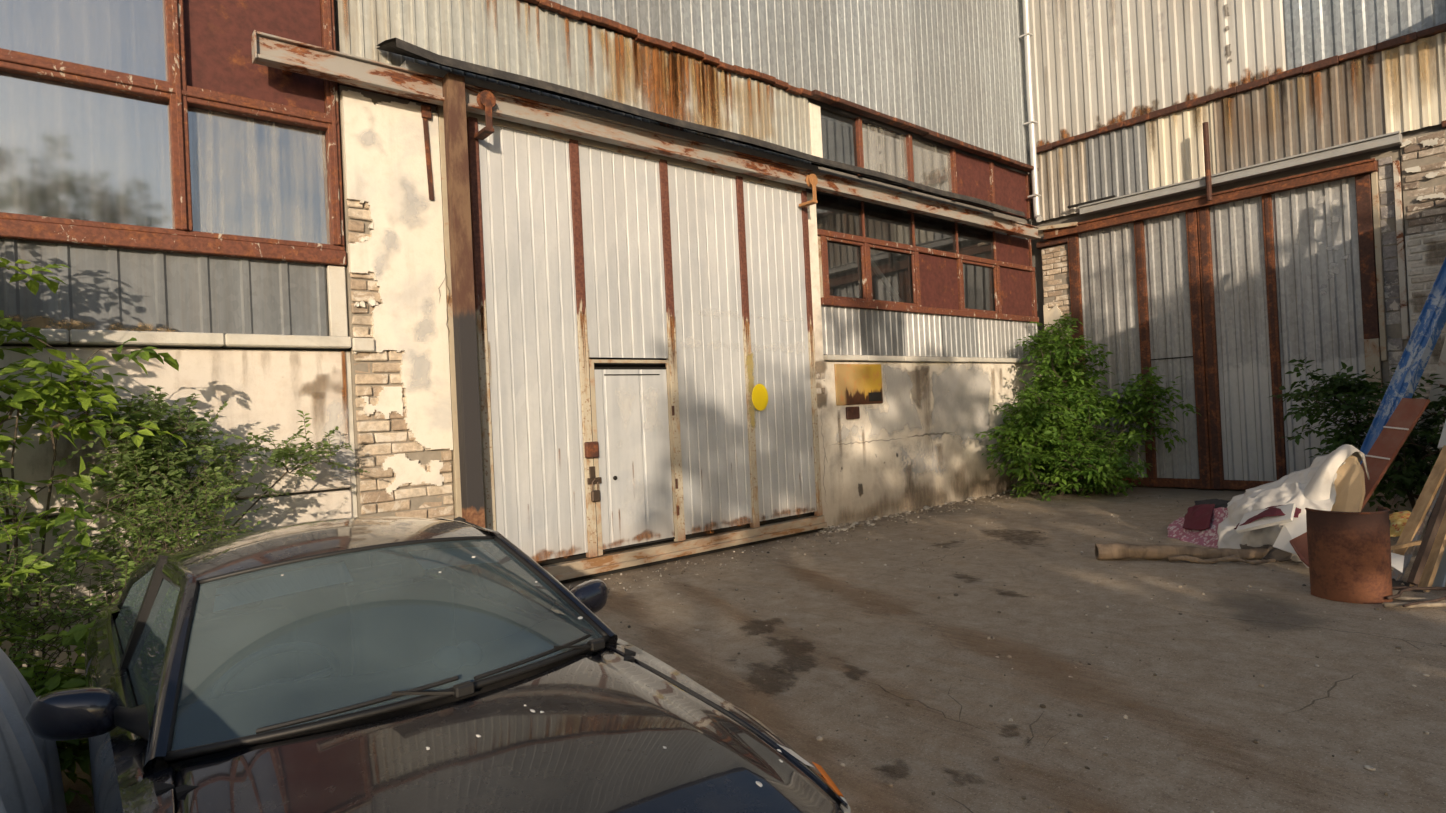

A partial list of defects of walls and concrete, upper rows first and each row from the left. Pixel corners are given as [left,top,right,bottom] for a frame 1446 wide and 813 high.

rust [588,25,773,139]
rust [1096,68,1292,133]
rust [1309,68,1331,102]
rust [1348,33,1446,88]
spalling [347,200,374,243]
spalling [350,268,454,519]
rust [603,532,653,549]